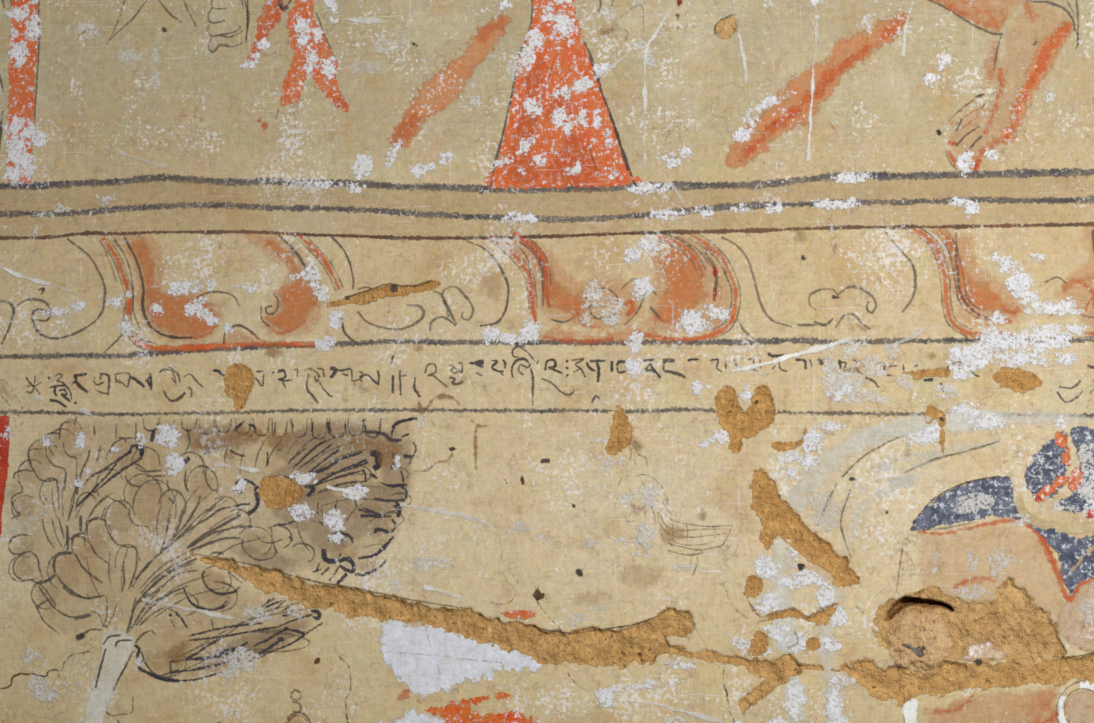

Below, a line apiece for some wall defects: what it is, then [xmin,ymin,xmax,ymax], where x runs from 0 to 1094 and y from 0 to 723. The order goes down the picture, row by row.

spalling [289,259,441,352]
spalling [224,363,254,411]
spalling [594,404,633,473]
spalling [688,379,777,454]
spalling [822,251,1091,495]
spalling [728,421,860,657]
peeling [948,492,994,514]
peeling [1010,443,1094,527]
spalling [873,542,1067,666]
peeling [216,646,262,684]
peeling [377,620,542,723]
peeling [594,658,705,707]